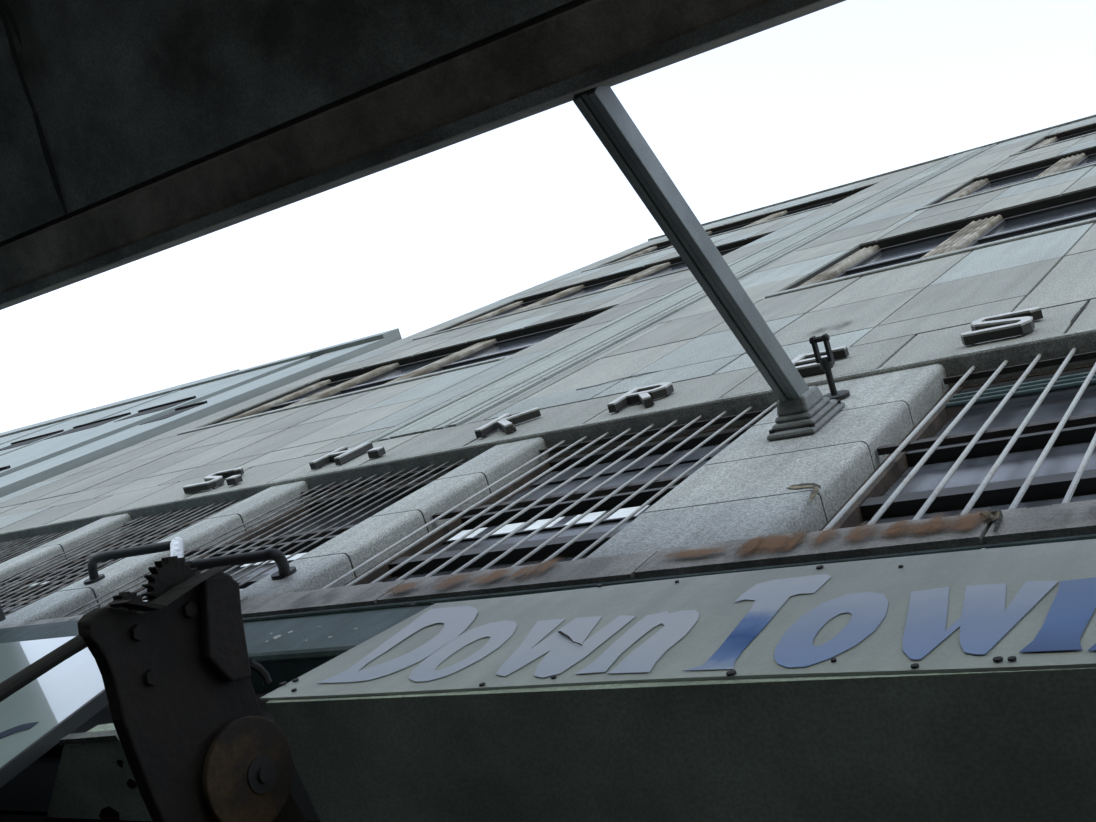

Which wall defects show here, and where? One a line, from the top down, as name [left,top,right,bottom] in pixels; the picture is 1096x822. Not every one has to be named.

rust [739,511,983,555]
rust [667,548,725,557]
rust [435,559,558,589]